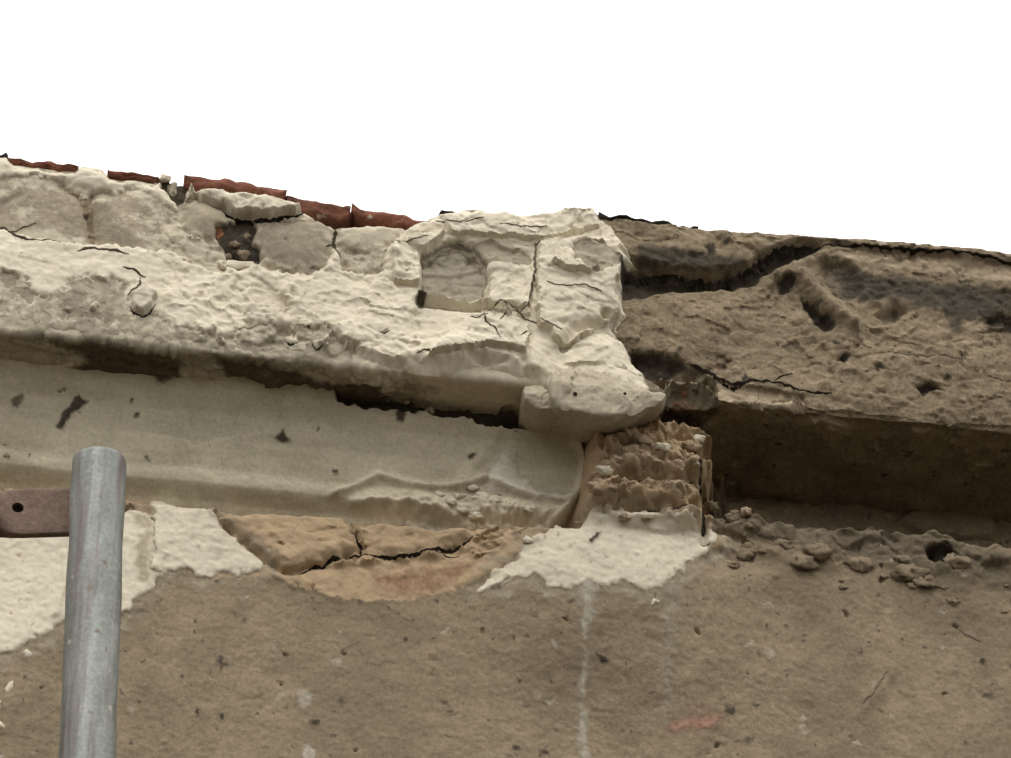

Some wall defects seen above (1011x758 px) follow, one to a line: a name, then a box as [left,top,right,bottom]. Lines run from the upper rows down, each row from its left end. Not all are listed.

crack [0,223,146,295]
spalling [215,223,259,270]
crack [391,217,1011,337]
crack [689,364,830,400]
spalling [587,454,624,496]
spalling [618,513,654,523]
crack [299,531,473,575]
spalling [707,491,1011,606]